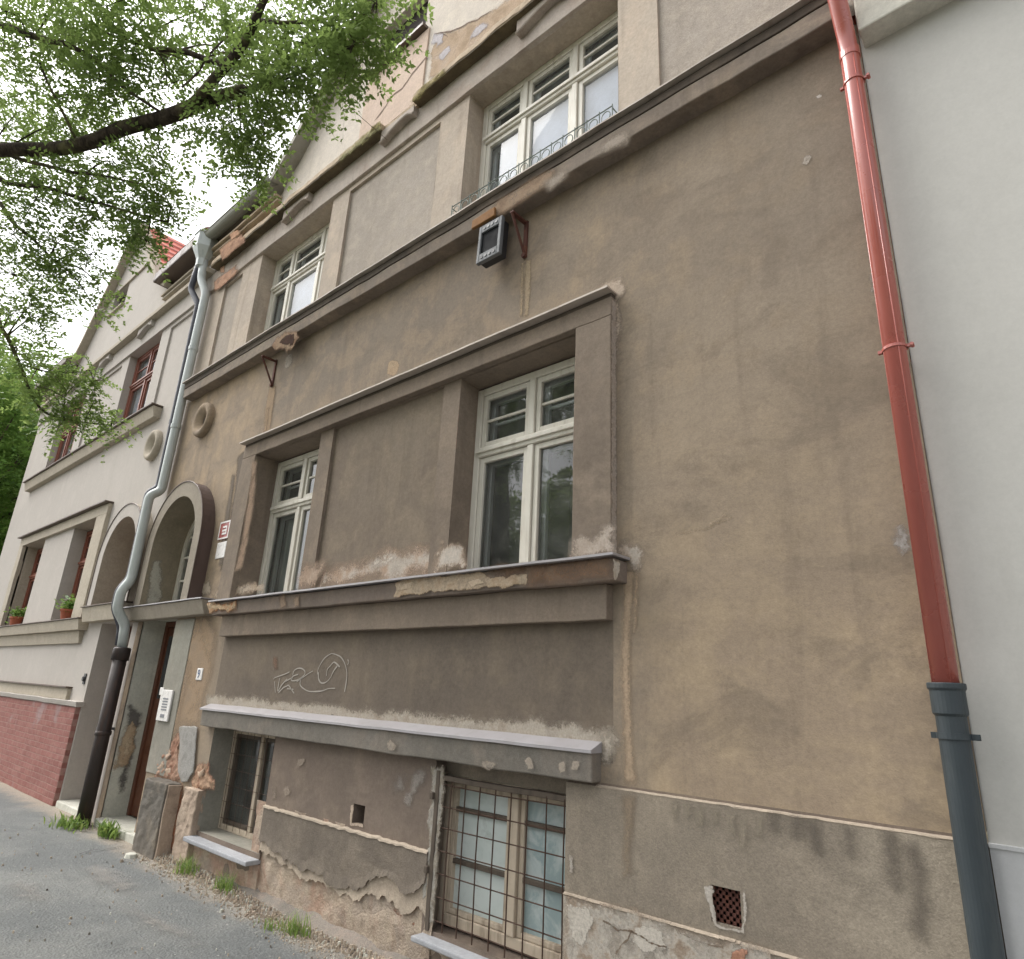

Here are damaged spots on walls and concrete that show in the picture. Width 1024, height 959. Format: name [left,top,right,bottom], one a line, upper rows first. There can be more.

flaking render [430,0,524,77]
flaking render [214,230,245,290]
flaking render [272,331,299,351]
flaking render [394,572,527,597]
flaking render [113,705,141,792]
flaking render [154,733,215,850]
flaking render [258,766,445,926]
crack [603,920,723,954]
peeling [563,885,771,959]